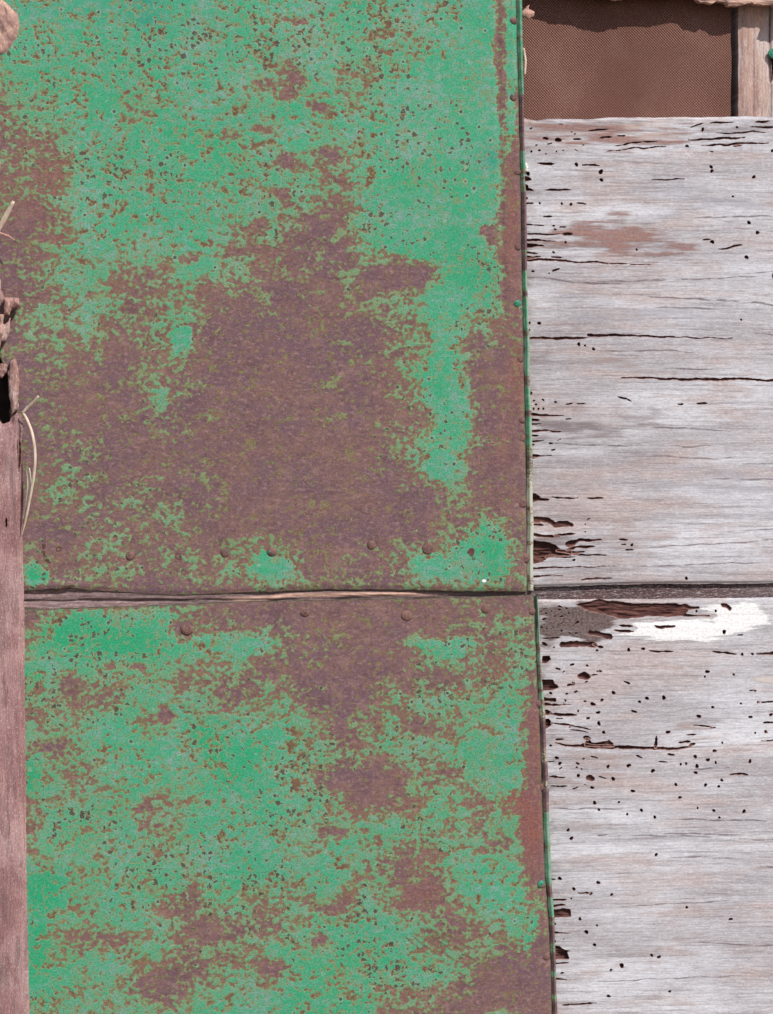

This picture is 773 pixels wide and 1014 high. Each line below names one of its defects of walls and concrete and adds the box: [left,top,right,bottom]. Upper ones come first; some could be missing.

crack [765,24,773,81]
crack [607,126,773,152]
crack [527,257,773,309]
crack [529,333,773,382]
crack [658,427,773,480]
corrosion [0,0,551,1014]
crack [555,735,696,751]